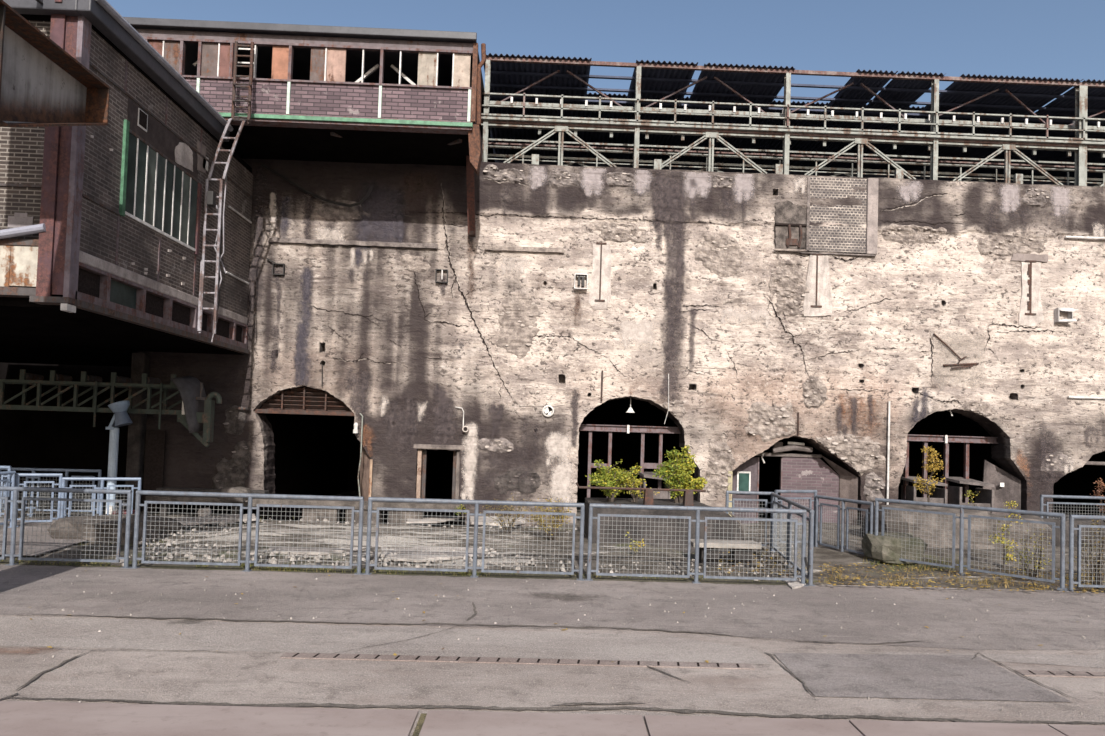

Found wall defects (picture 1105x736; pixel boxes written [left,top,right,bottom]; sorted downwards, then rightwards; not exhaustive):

leakage [249,170,290,312]
leakage [349,182,404,281]
crack [684,219,766,227]
leakage [295,268,311,385]
leakage [346,370,369,426]
leakage [432,385,456,447]
crack [402,183,658,405]
leakage [651,173,696,404]
crack [666,304,747,377]
crack [765,296,894,376]
crack [920,335,962,404]